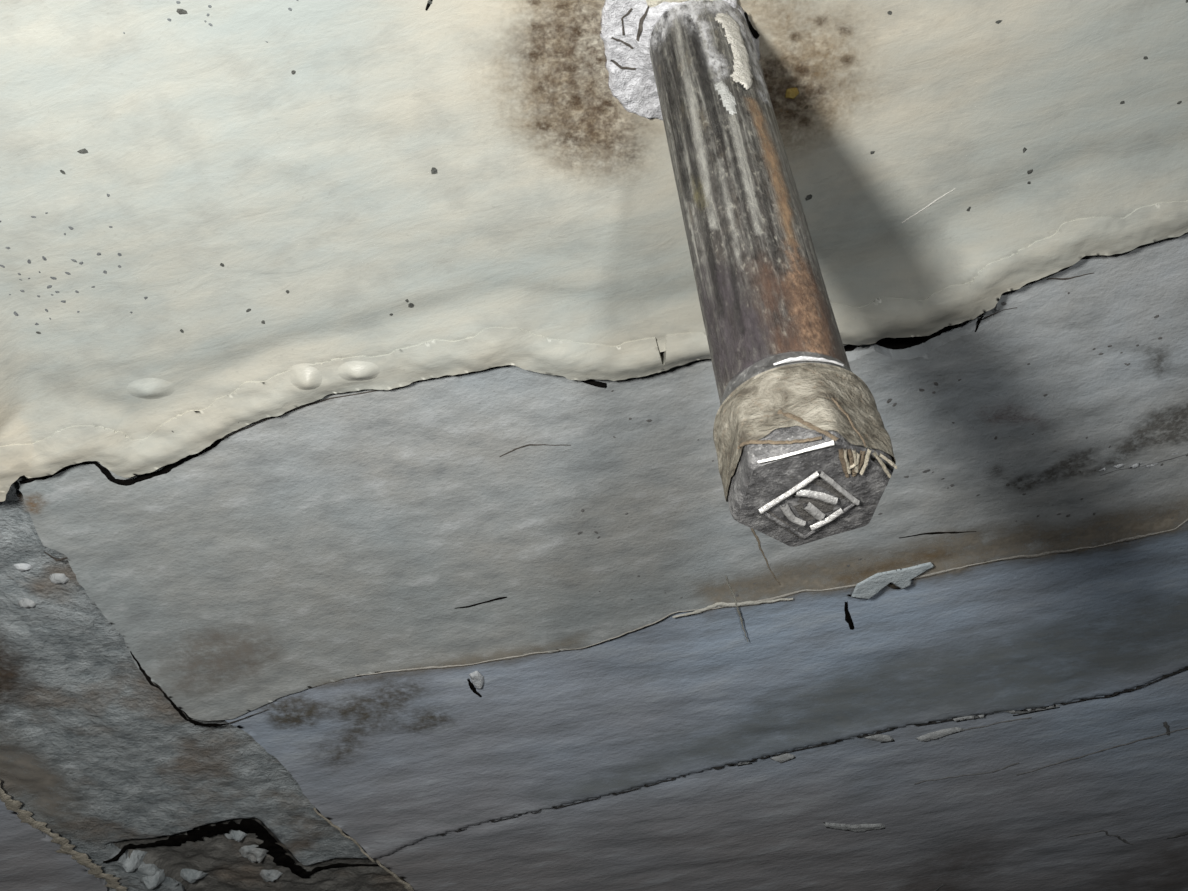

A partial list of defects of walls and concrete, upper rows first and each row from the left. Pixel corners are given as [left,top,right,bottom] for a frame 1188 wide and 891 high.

rust [528,0,619,148]
rust [749,33,850,355]
peeling [830,200,1188,346]
spalling [1013,406,1188,490]
flaking render [0,327,711,891]
crack [455,597,507,609]
peeling [355,519,1188,697]
crack [844,602,854,630]
crack [713,666,1188,770]
crack [914,721,1188,785]
crack [439,775,685,836]
crack [822,822,886,832]